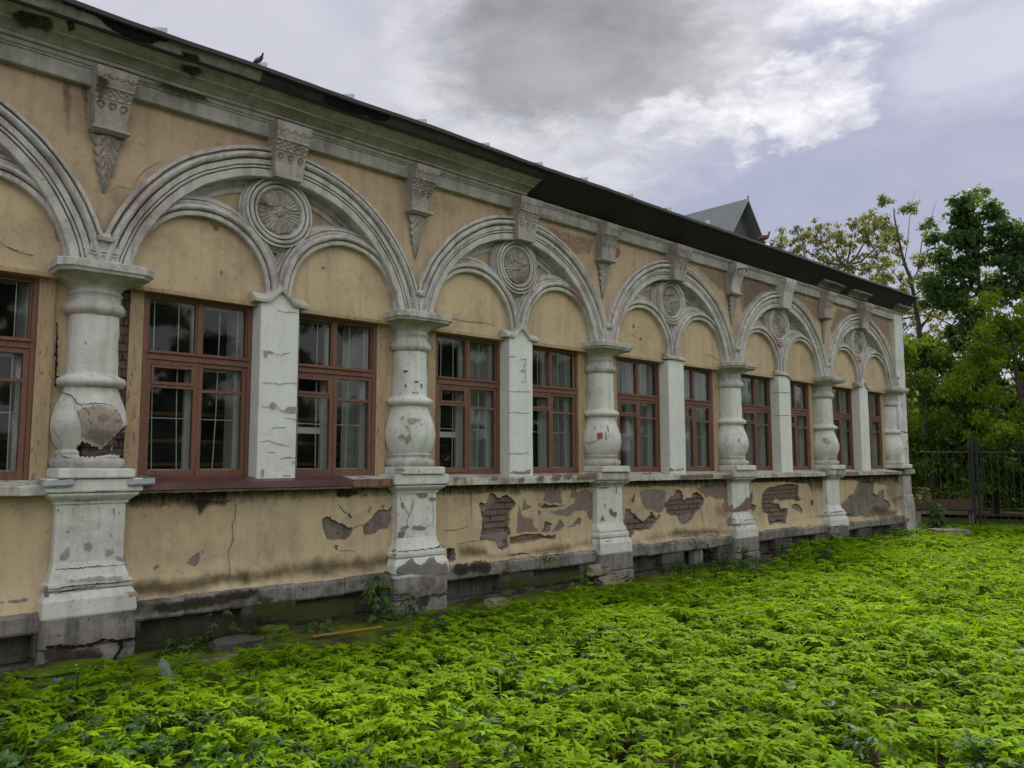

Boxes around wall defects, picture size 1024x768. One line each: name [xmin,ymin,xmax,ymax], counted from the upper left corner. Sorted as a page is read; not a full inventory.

flaking render [78,290,130,458]
peeling [394,416,421,445]
peeling [322,489,456,575]
flaking render [479,468,803,551]
flaking render [841,471,903,517]
peeling [177,551,216,571]
damp [133,557,390,594]
crack [45,637,136,660]